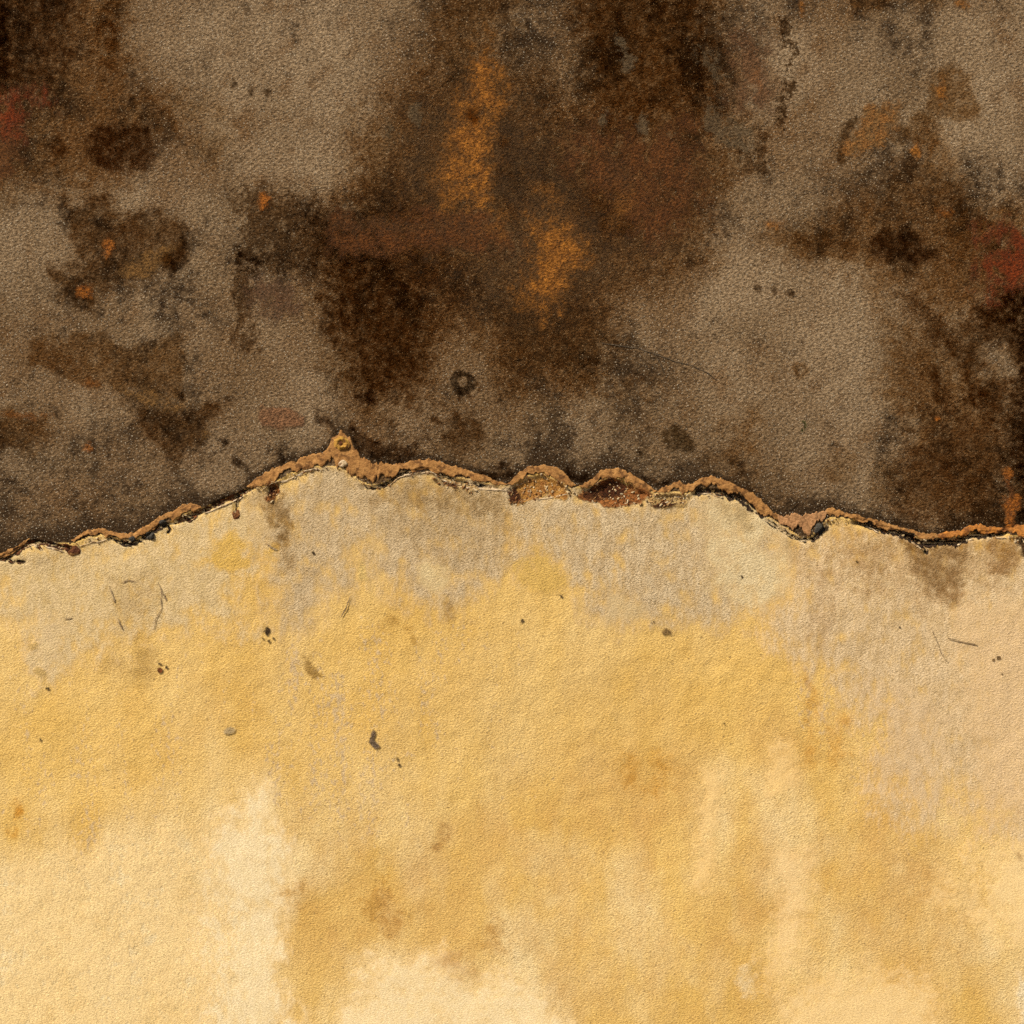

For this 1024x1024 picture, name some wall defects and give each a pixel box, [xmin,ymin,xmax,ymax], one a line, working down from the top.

leakage [90,125,154,169]
corrosion [439,49,511,210]
leakage [50,196,184,301]
corrosion [522,219,589,320]
leakage [872,229,938,263]
leakage [936,286,1024,446]
peeling [0,430,1024,847]